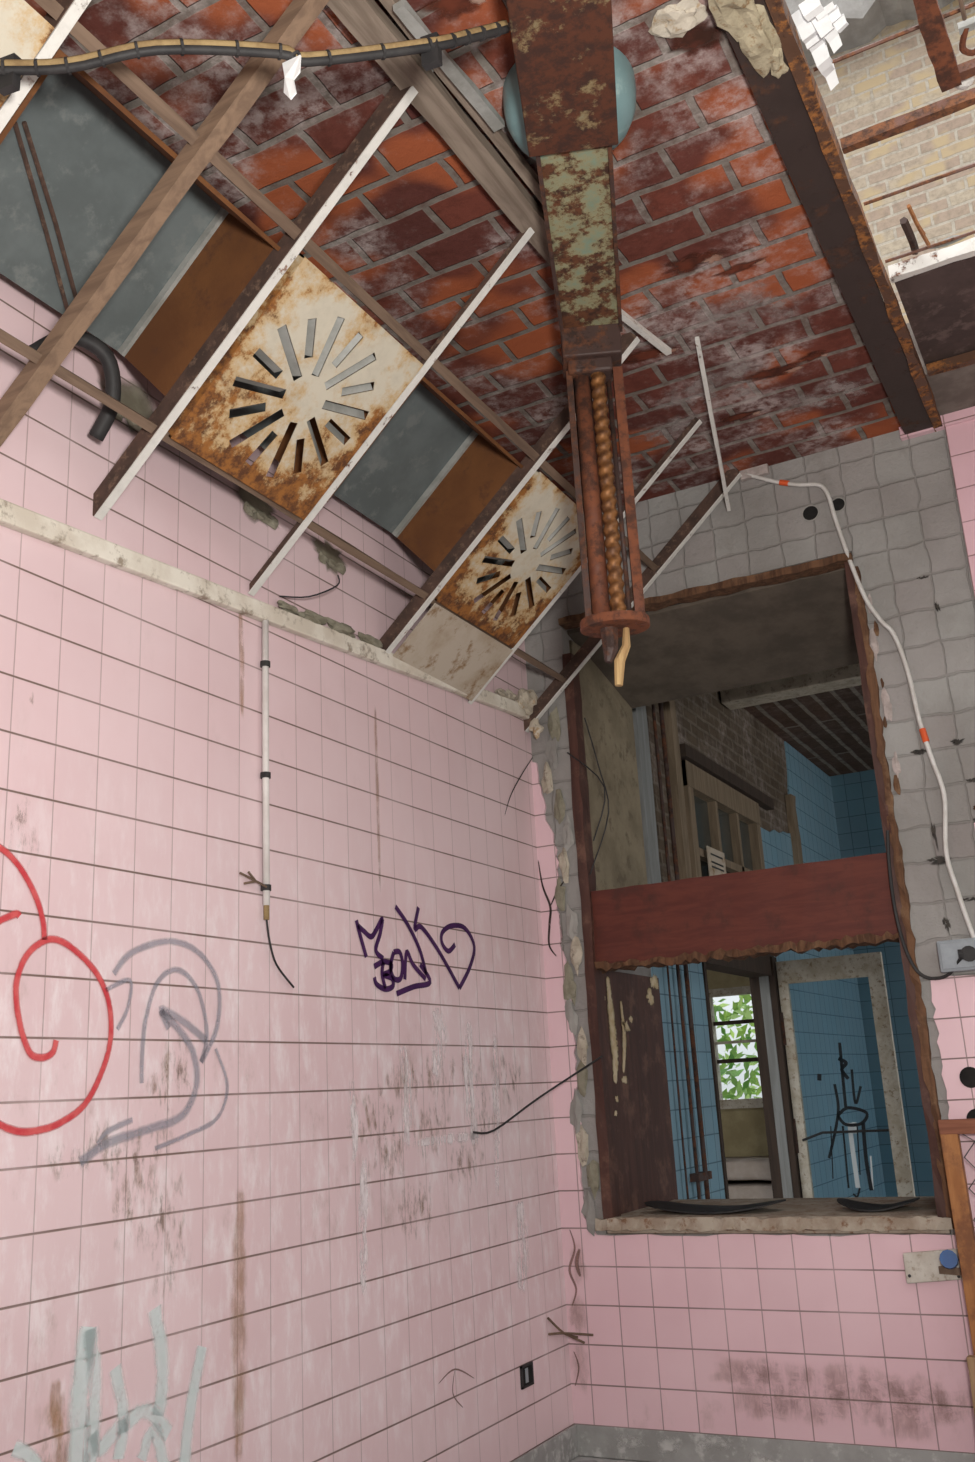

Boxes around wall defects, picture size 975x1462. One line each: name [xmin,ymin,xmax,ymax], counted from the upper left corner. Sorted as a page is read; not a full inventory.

spalling [648,0,789,79]
spalling [541,706,599,1236]